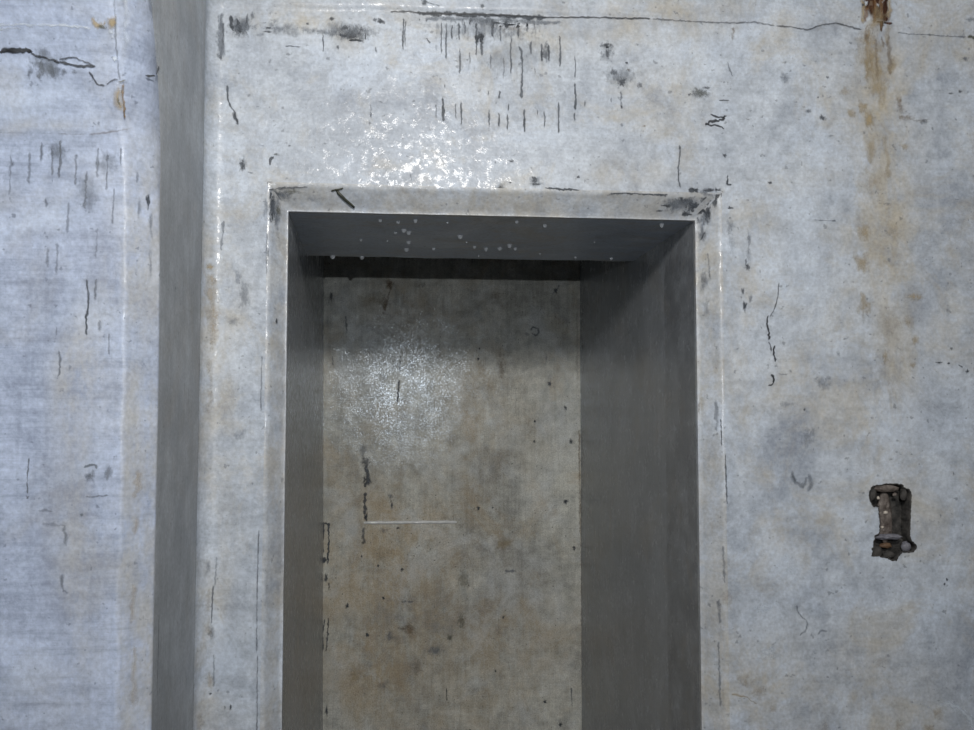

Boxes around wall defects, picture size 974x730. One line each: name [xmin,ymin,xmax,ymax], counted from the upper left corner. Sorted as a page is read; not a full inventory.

crack [391,10,650,20]
crack [778,22,861,30]
corrosion [861,0,892,31]
crack [0,47,118,86]